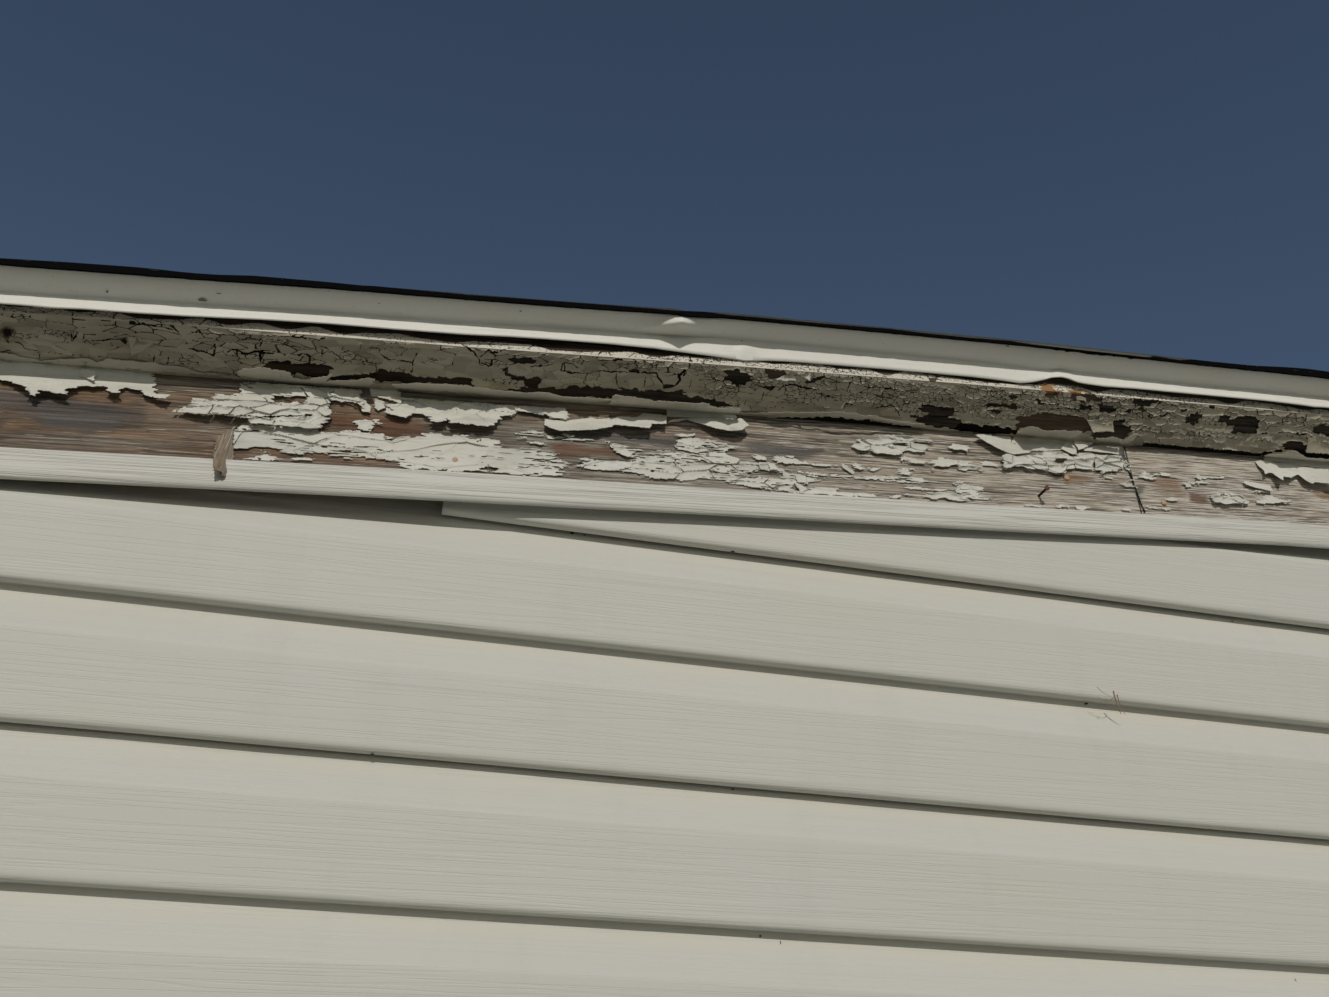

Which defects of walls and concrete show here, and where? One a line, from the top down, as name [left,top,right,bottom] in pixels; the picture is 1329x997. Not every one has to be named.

crack [71,322,418,372]
crack [461,343,494,366]
crack [530,358,686,386]
crack [720,376,918,415]
crack [965,387,1173,419]
peeling [0,350,1329,512]
crack [1258,414,1329,435]
crack [1122,450,1146,513]